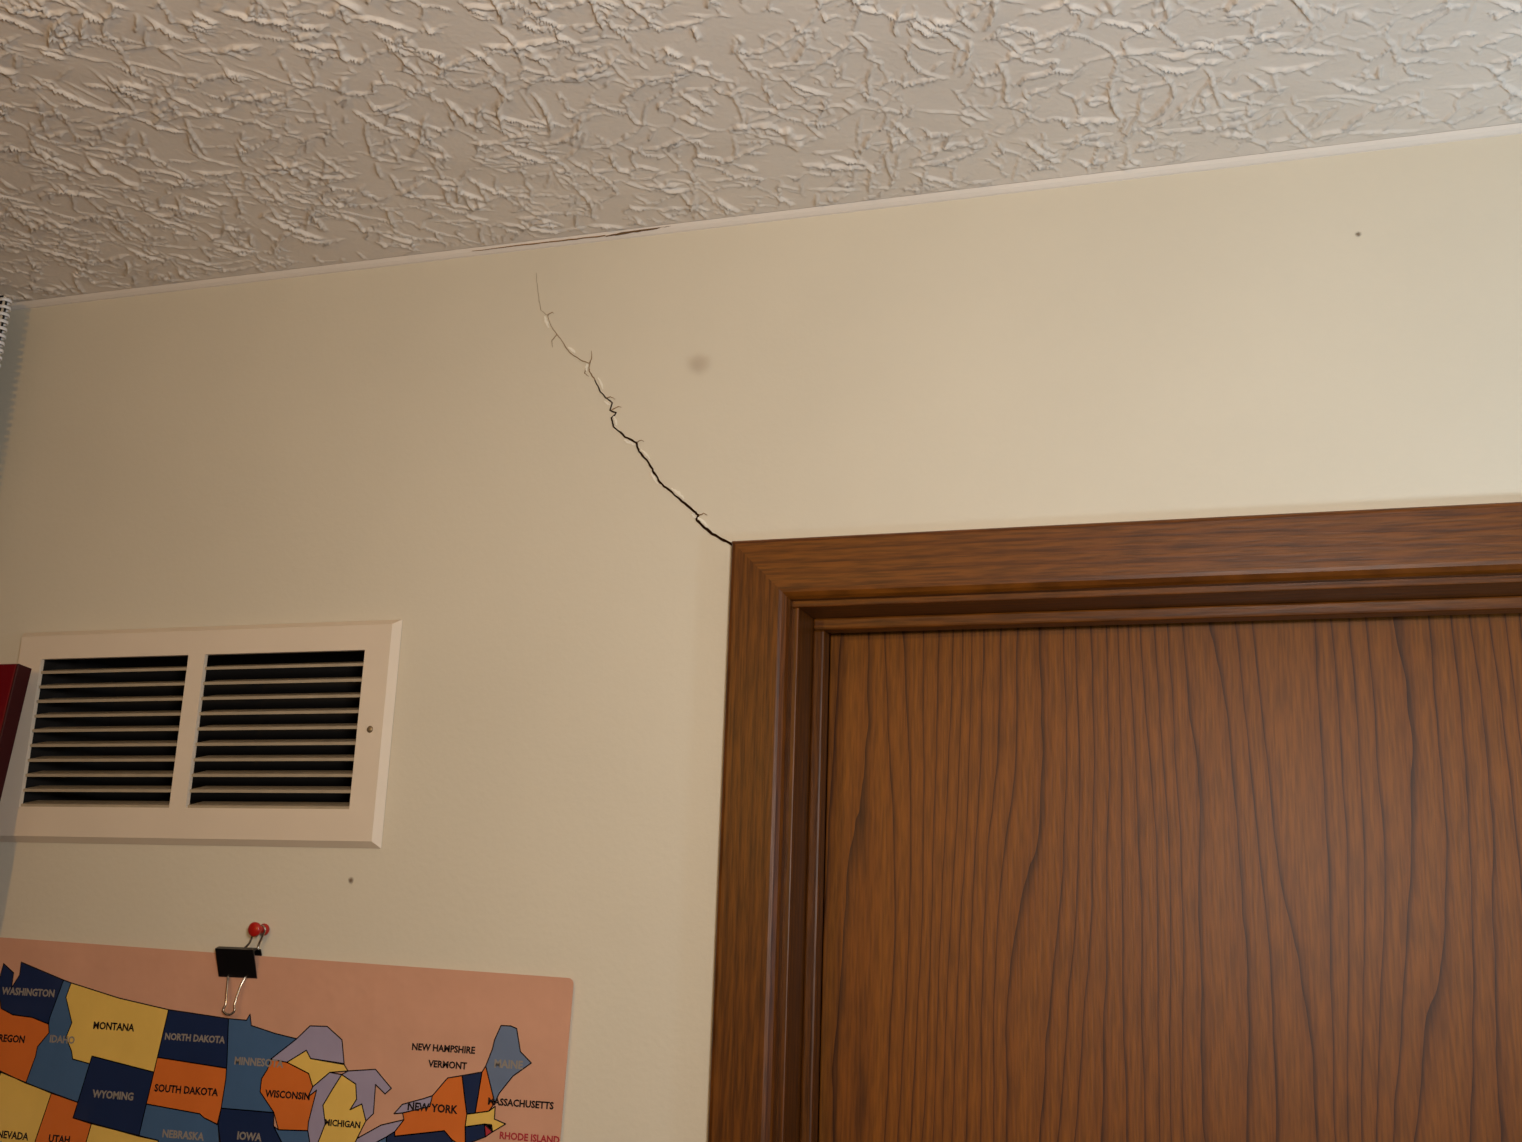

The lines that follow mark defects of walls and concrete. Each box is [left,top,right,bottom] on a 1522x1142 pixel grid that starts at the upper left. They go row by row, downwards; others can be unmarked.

crack [475,226,732,546]